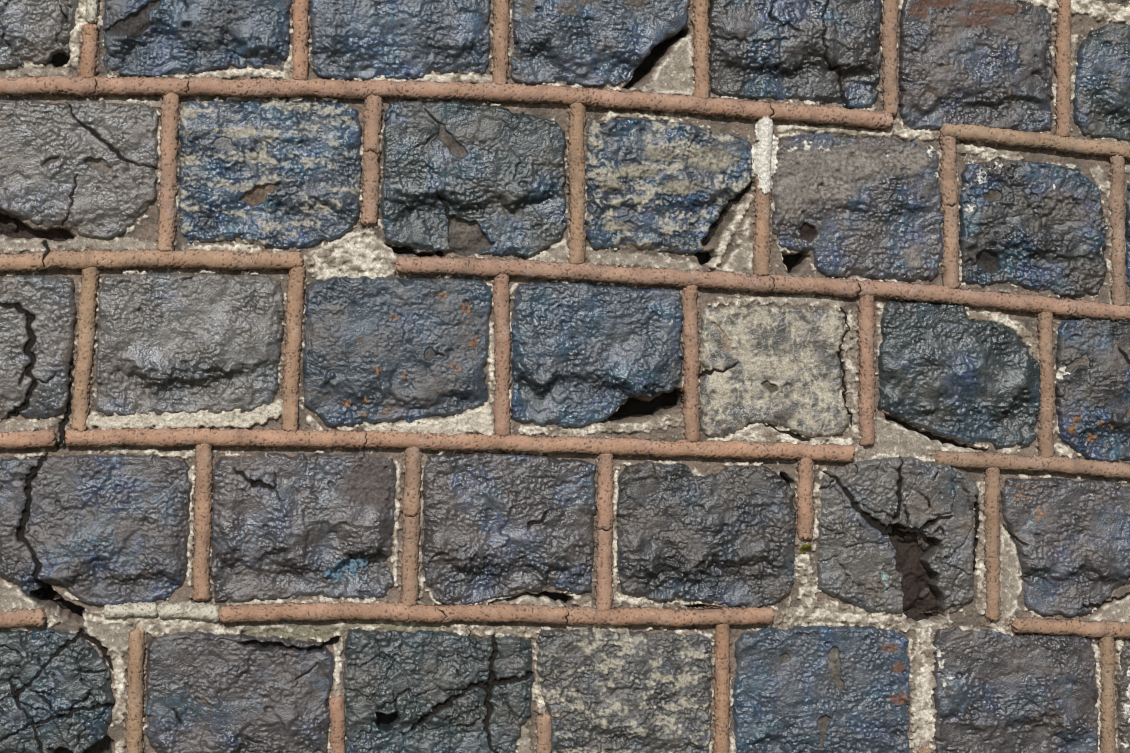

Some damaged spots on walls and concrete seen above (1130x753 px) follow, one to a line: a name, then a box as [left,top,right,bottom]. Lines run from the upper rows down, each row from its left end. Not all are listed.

crack [66,102,157,169]
water stain [605,222,627,231]
water stain [598,148,674,190]
water stain [662,180,698,195]
water stain [688,149,736,171]
crack [704,184,751,242]
water stain [750,115,939,221]
crack [0,303,75,589]
crack [820,459,1026,572]
spalling [888,524,939,621]
crack [9,631,113,753]
crack [393,609,532,753]